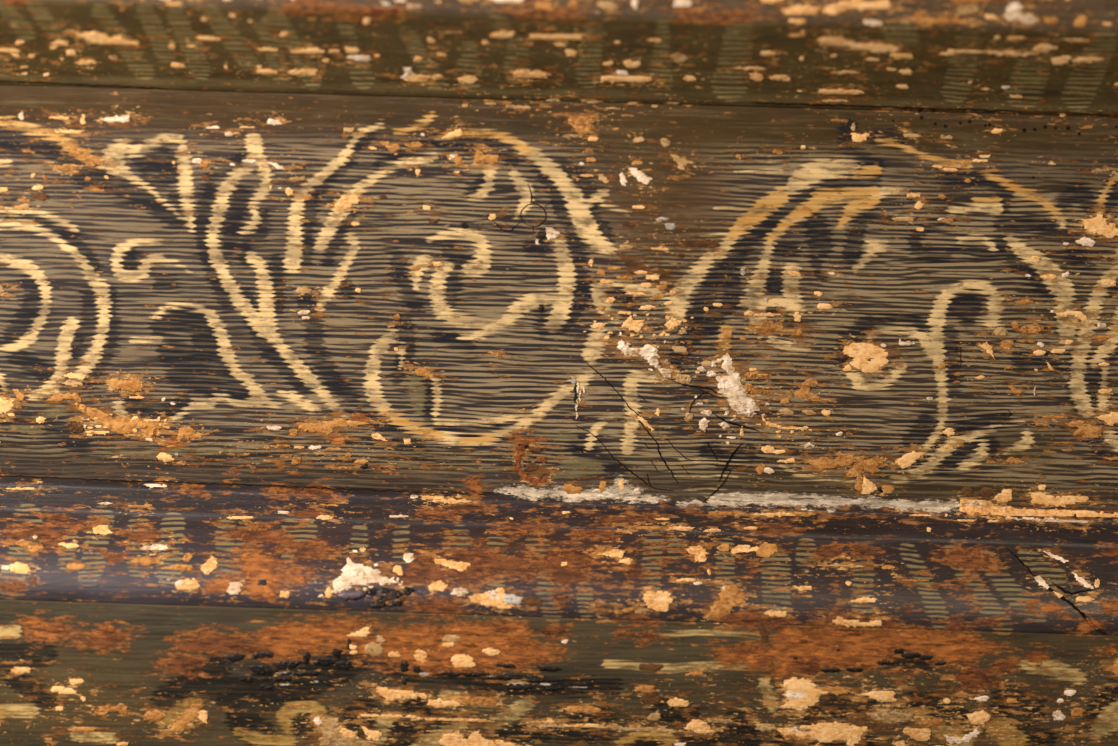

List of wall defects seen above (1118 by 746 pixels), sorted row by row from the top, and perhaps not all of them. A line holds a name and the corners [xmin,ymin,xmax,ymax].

peeling [49,29,139,65]
peeling [761,0,913,89]
peeling [909,0,1105,65]
spalling [46,372,202,462]
crack [573,363,758,502]
spalling [945,484,1118,523]
peeling [174,553,218,590]
spalling [318,547,543,609]
peeling [593,510,778,619]
crack [1007,548,1108,635]
spalling [1034,550,1100,602]
peeling [313,687,515,746]